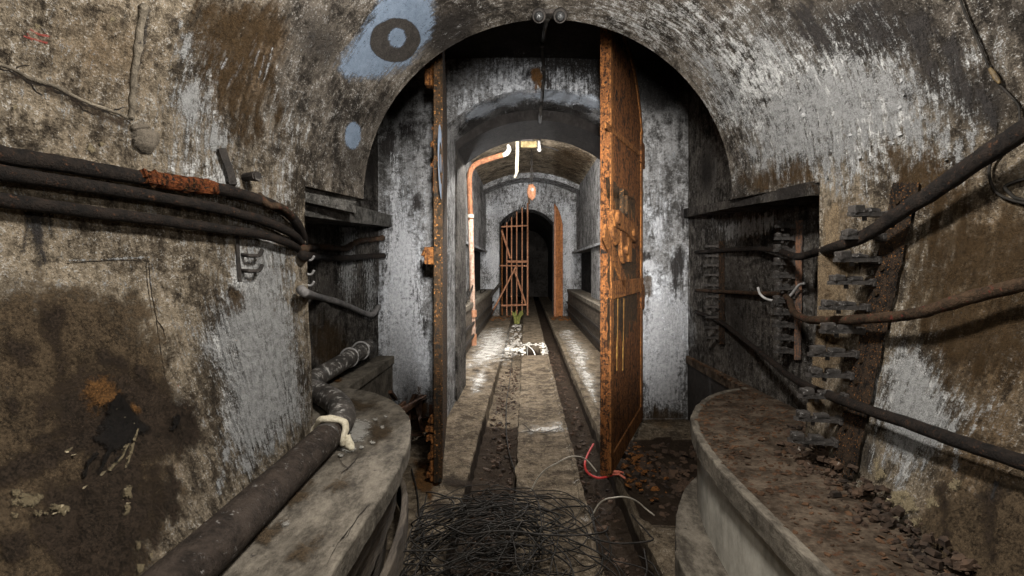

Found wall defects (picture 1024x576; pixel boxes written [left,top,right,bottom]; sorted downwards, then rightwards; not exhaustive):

efflorescence [170,21,194,69]
efflorescence [165,79,240,161]
corrosion [83,374,121,408]
damp [0,211,310,576]
damp [350,399,394,444]